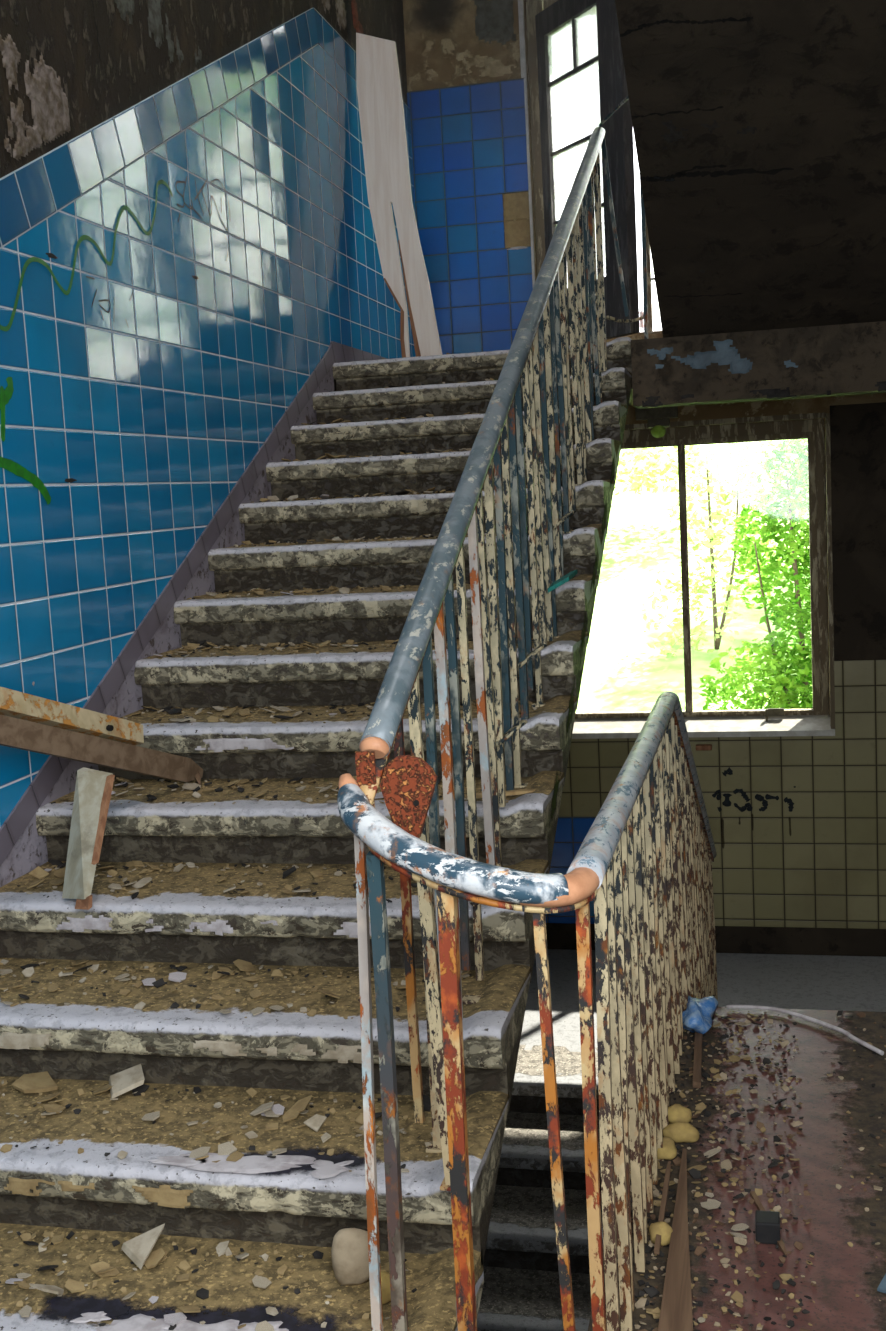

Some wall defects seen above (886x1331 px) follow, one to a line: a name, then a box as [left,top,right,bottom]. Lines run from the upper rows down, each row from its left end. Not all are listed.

damp [414,0,459,31]
peeling [0,33,70,161]
peeling [503,192,531,250]
peeling [70,1296,289,1331]